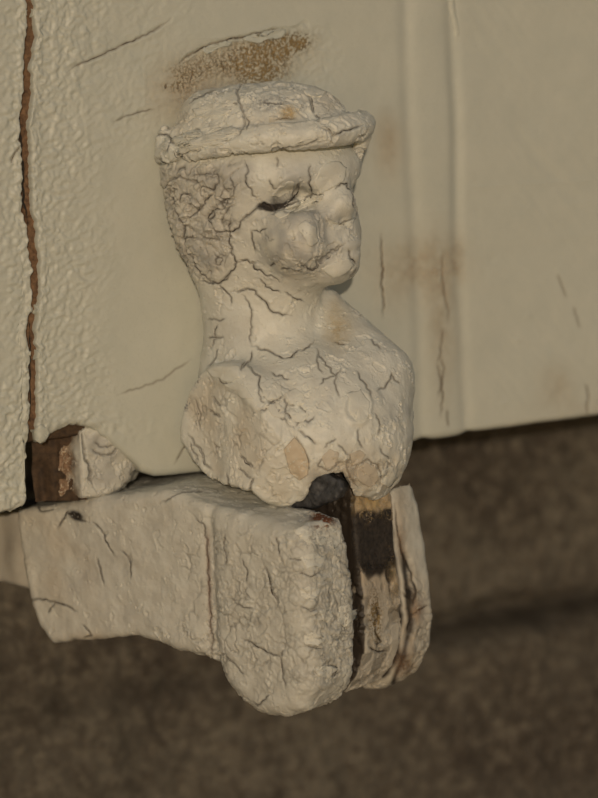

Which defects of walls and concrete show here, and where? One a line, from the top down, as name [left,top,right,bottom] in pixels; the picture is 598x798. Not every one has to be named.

crack [11,0,41,430]
crack [164,185,389,487]
crack [437,253,449,427]
spalling [32,424,87,502]
crack [198,521,277,671]